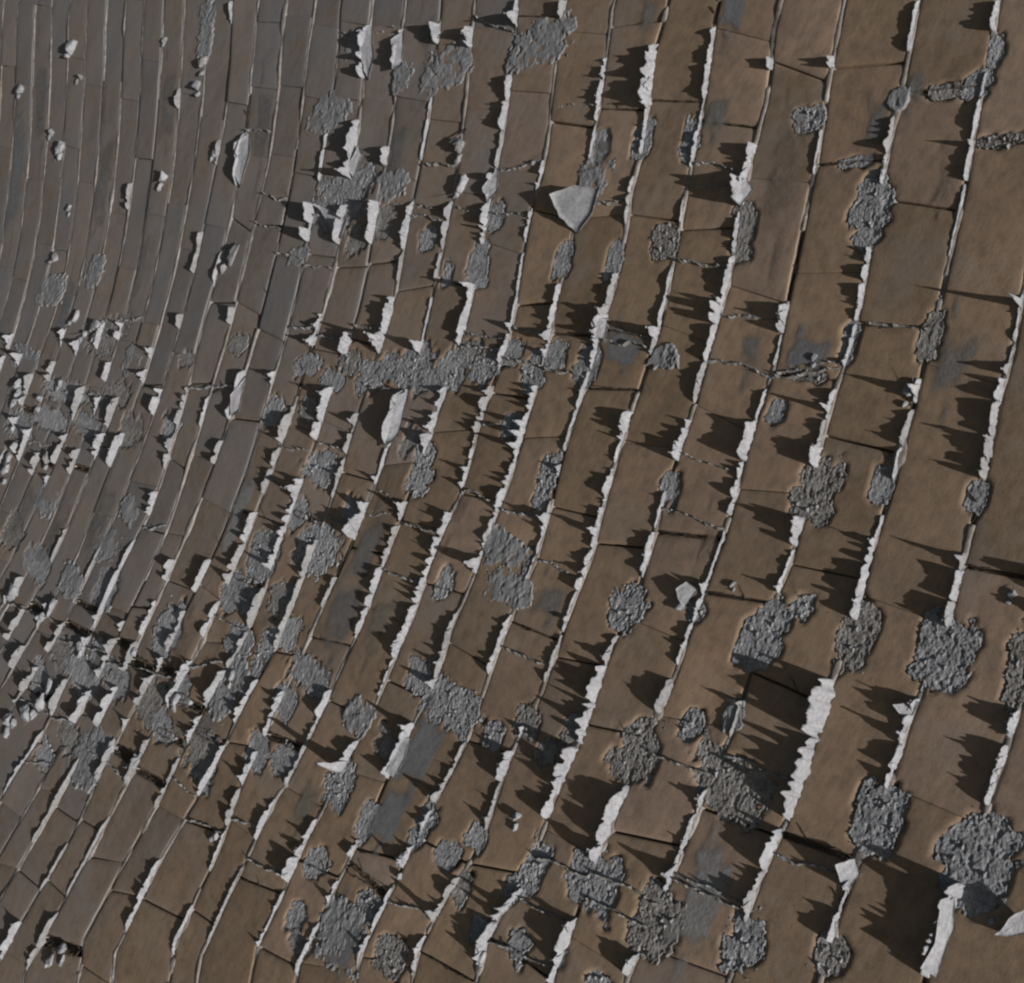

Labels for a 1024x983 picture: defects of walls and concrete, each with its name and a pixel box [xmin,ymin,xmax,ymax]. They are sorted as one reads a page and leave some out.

peeling [549,185,630,281]
crack [788,232,804,301]
spalling [209,304,611,725]
crack [29,599,98,636]
crack [117,581,225,758]
spalling [388,495,592,792]
crack [114,744,167,788]
crack [45,934,82,958]
spalling [466,830,689,972]
crack [783,824,855,860]
spalling [835,775,914,894]
spalling [921,755,1024,977]